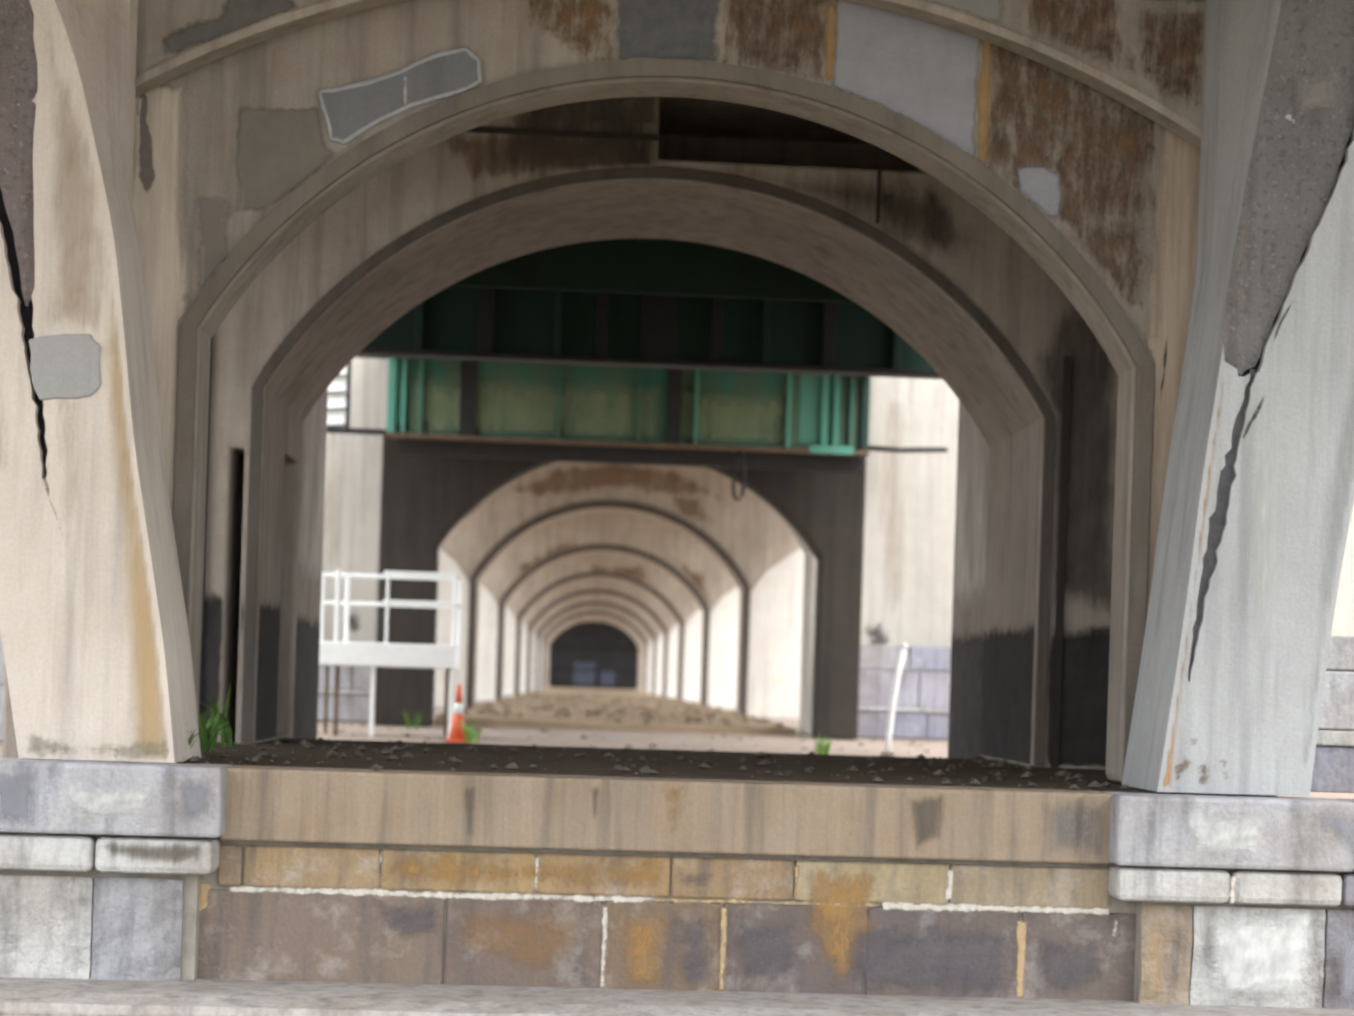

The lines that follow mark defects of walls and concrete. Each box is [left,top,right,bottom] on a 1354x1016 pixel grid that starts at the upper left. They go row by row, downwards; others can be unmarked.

spalling [0,0,38,306]
peeling [163,0,294,52]
corrosion [529,0,612,60]
corrosion [725,0,835,80]
corrosion [978,41,1155,303]
spalling [1222,0,1354,376]
crack [1328,132,1352,199]
crack [0,187,56,515]
crack [1188,296,1291,681]
corrosion [813,873,868,970]